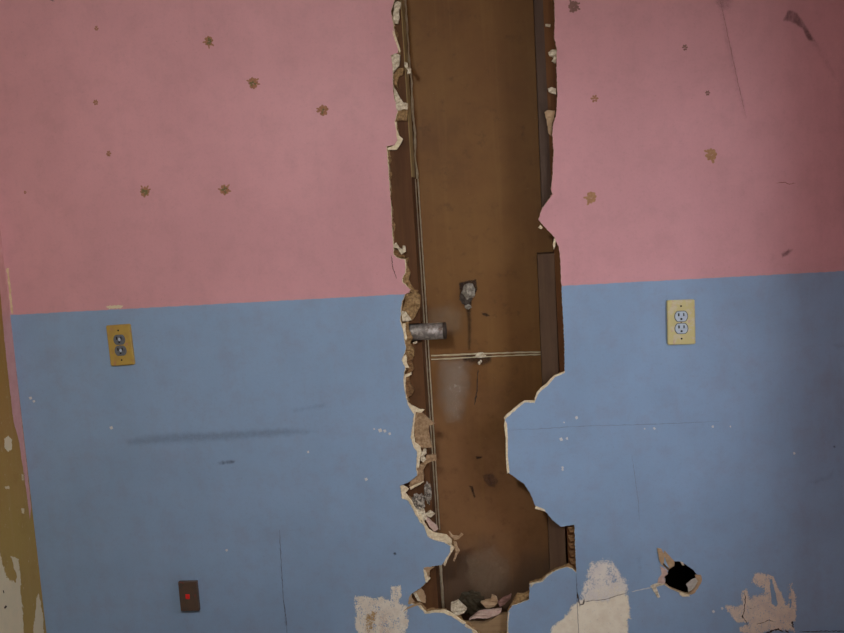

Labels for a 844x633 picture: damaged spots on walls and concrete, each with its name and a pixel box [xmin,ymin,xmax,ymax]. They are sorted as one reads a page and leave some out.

spalling [504,0,565,474]
spalling [386,0,482,633]
peeling [0,556,44,633]
spalling [499,521,576,633]
spalling [650,548,702,598]